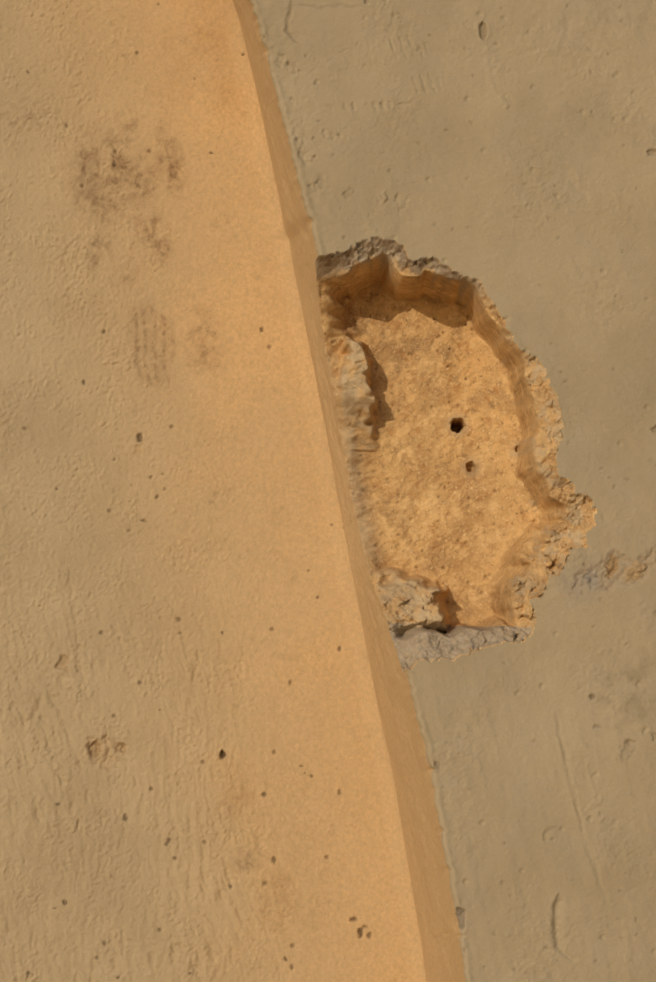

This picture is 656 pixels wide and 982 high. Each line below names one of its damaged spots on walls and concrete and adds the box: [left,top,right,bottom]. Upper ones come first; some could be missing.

spalling [316,238,656,673]